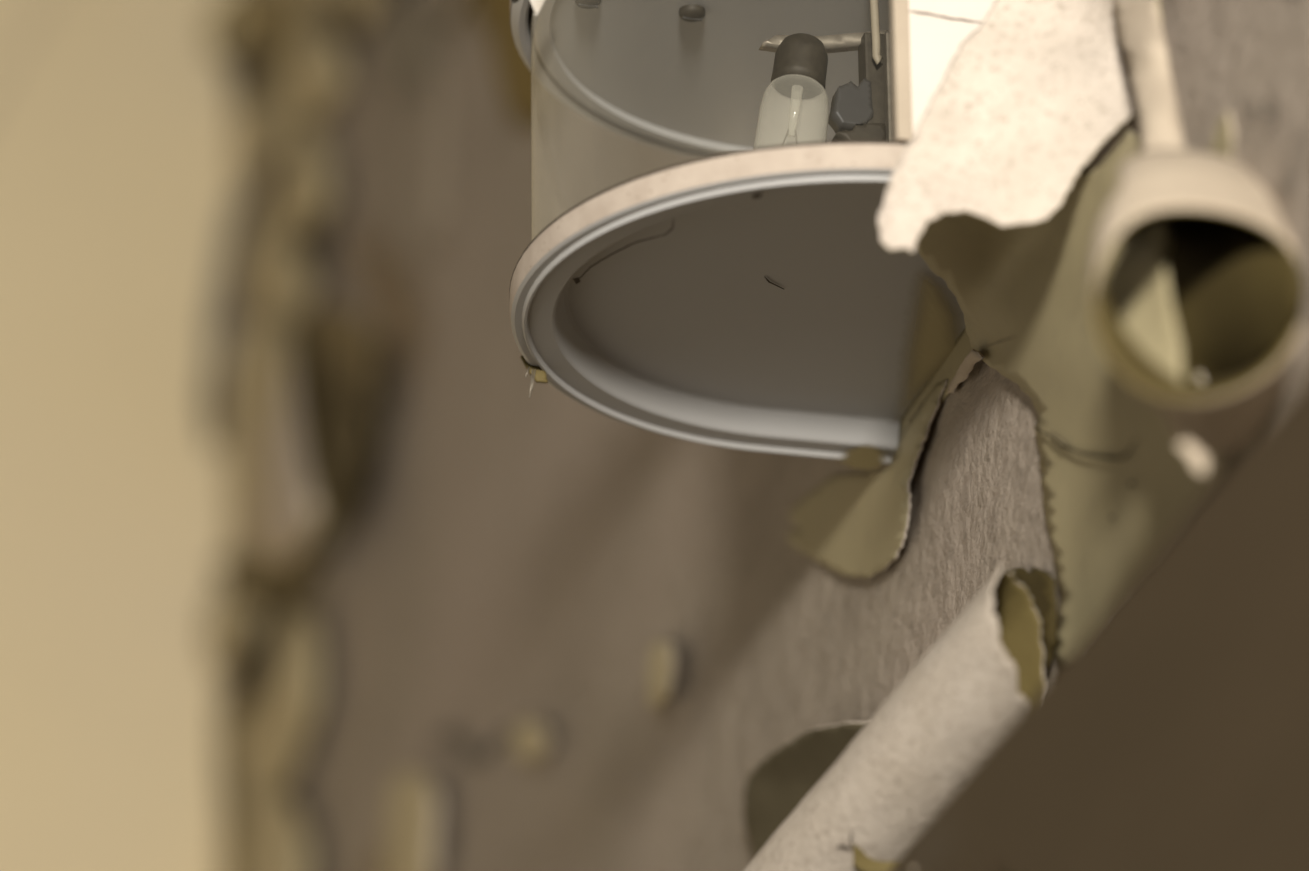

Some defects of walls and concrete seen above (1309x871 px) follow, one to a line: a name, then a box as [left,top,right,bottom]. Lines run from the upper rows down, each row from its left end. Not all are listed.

peeling [787,0,1225,669]
peeling [648,639,676,709]